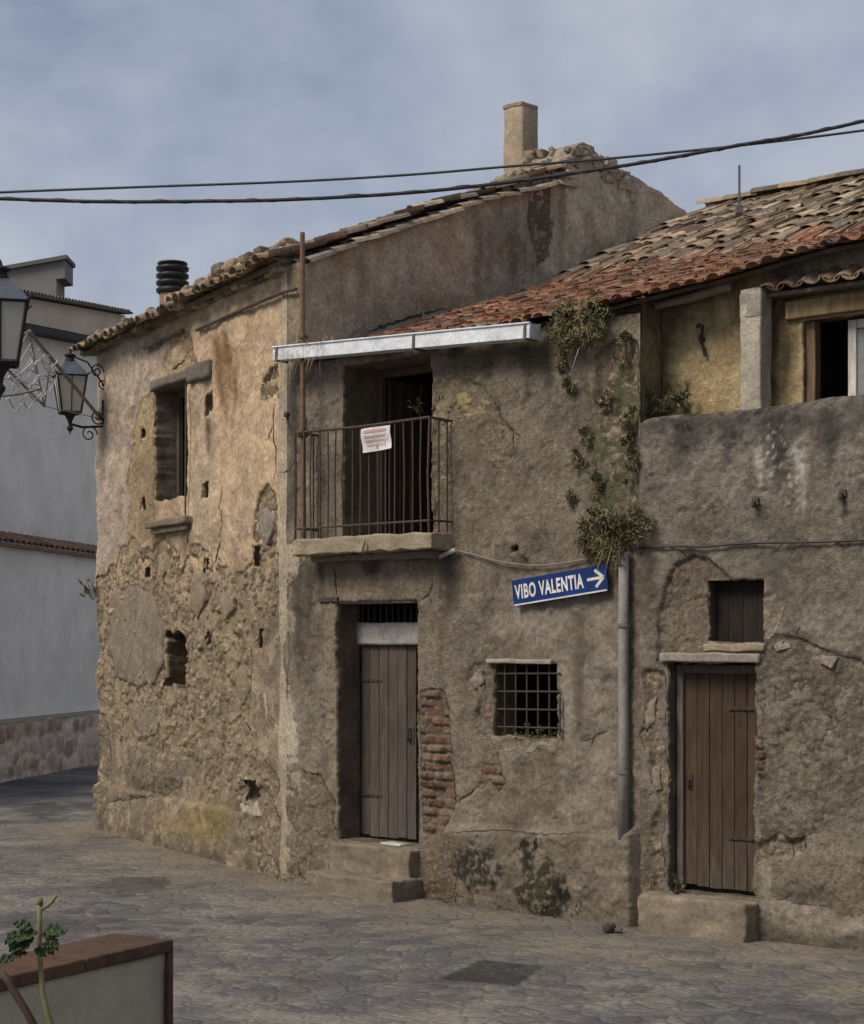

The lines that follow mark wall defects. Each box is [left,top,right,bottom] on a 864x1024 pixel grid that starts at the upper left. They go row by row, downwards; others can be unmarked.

spalling [260,366,279,403]
spalling [93,391,338,883]
crack [767,626,858,661]
flaking render [418,688,456,835]
spalling [465,661,558,792]
crack [454,829,594,843]
mould [454,837,570,916]